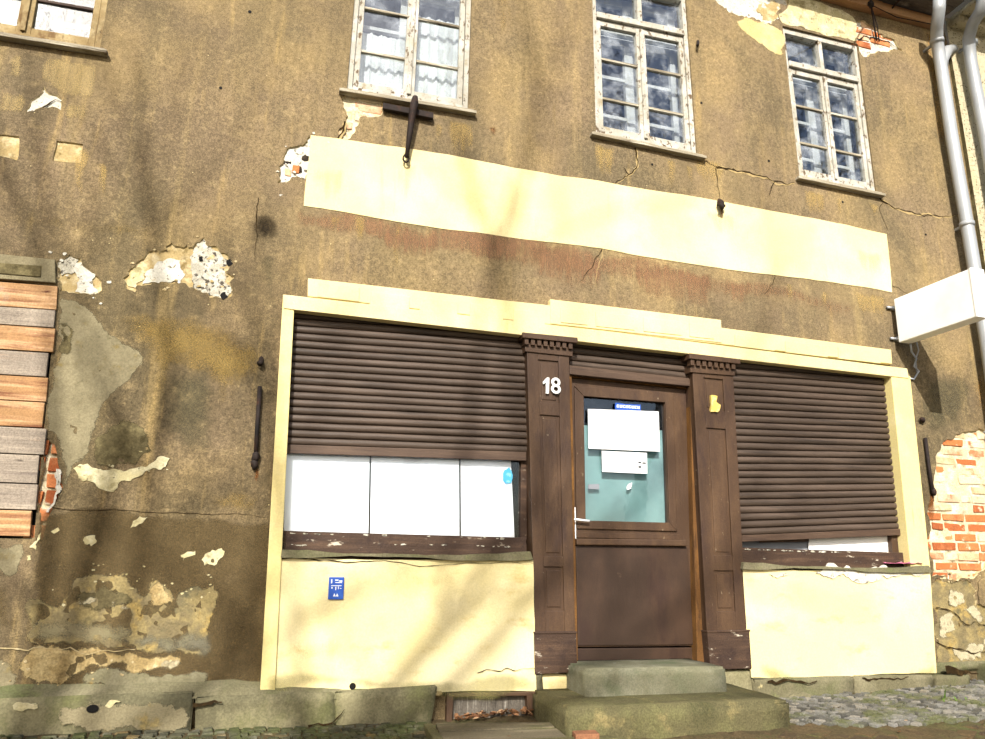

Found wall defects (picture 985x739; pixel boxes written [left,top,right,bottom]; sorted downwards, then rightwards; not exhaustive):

flaking render [716,0,902,57]
flaking render [338,92,383,140]
flaking render [276,132,315,196]
crack [615,148,639,184]
crack [704,160,794,198]
crack [879,198,958,227]
flaking render [49,250,111,304]
flaking render [123,231,237,305]
flaking render [73,419,170,492]
flaking render [23,424,63,561]
flaking render [745,428,985,662]
flaking render [0,548,225,686]